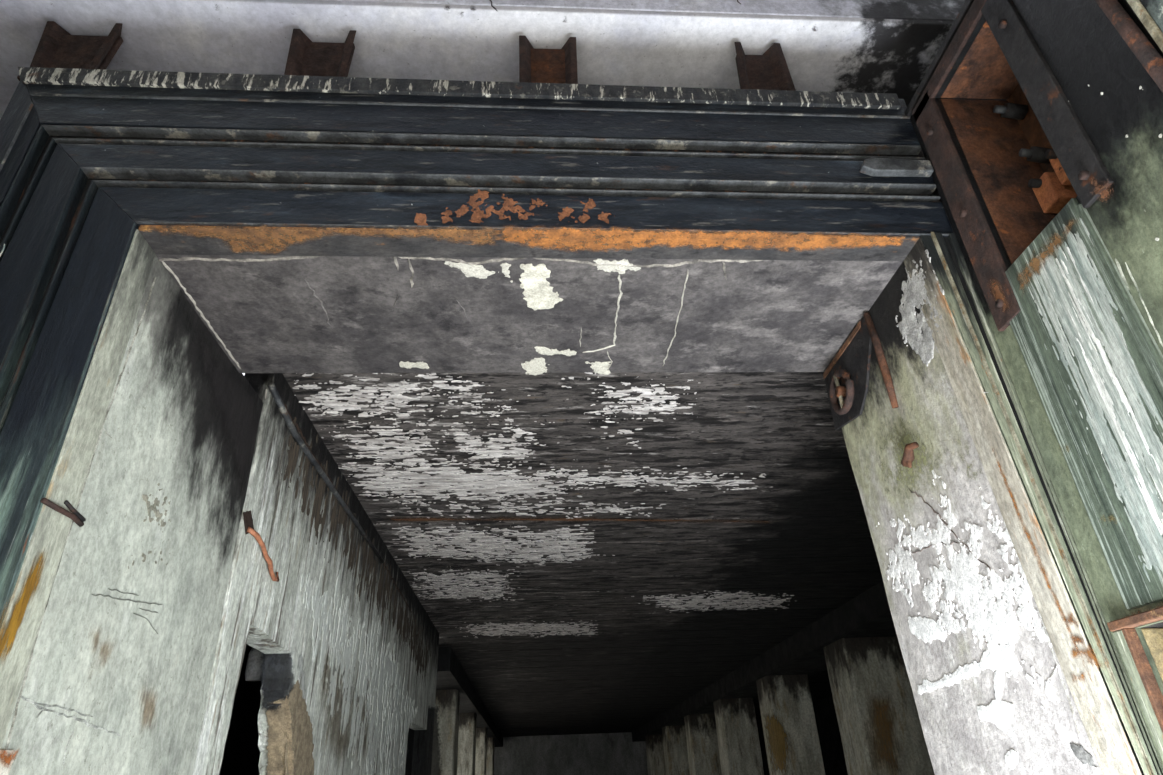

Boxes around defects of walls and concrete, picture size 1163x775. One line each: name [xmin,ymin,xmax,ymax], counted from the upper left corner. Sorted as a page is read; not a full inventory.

rust [160,189,905,254]
rust [1091,178,1110,200]
peeling [444,261,563,310]
peeling [593,259,641,274]
peeling [895,249,944,366]
peeling [281,346,794,775]
peeling [878,470,1060,733]
spalling [266,680,314,775]
spalling [1065,739,1096,767]